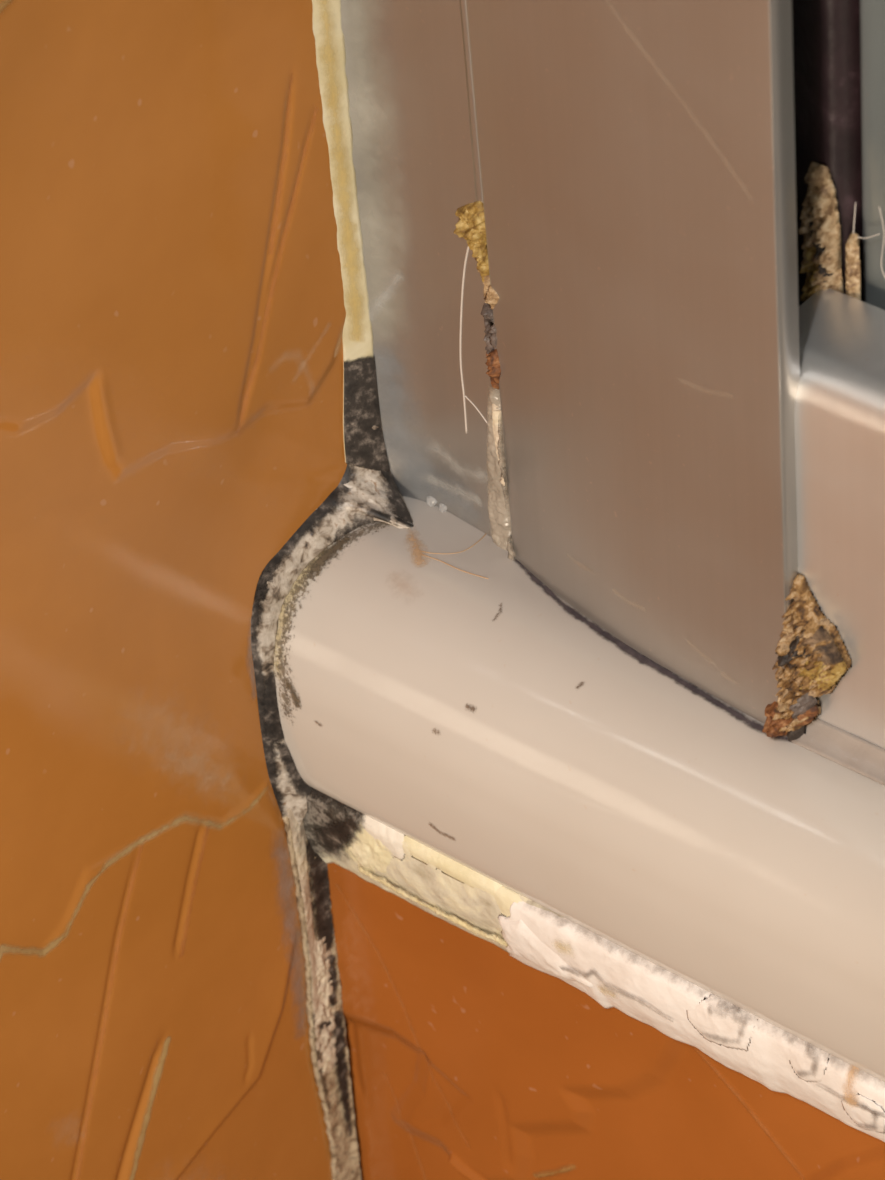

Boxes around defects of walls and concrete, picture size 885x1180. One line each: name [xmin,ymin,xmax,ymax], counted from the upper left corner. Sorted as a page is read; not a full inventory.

water stain [323,0,361,340]
crack [0,800,257,958]
water stain [251,357,414,1136]
rust [762,573,852,742]